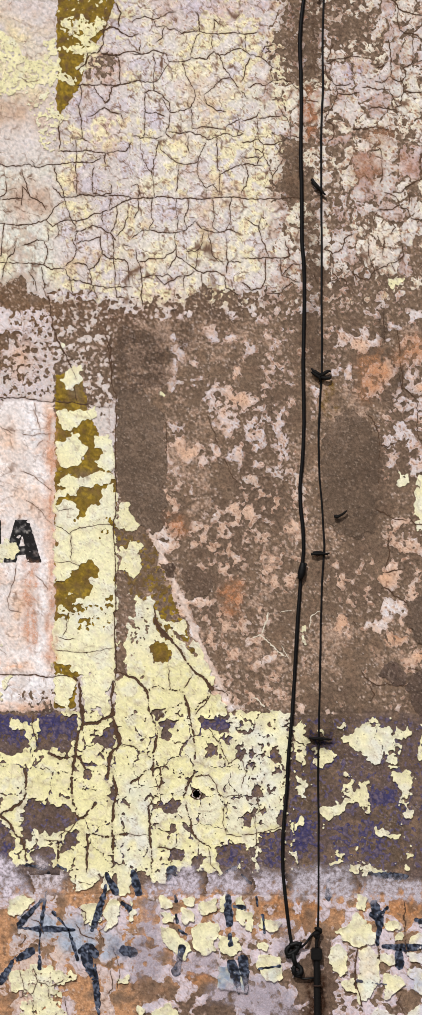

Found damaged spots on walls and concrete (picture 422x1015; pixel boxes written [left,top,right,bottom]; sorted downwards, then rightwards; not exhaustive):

peeling [0,0,121,152]
flaking render [265,0,422,167]
crack [0,0,422,444]
flaking render [265,134,300,211]
flaking render [279,223,301,260]
flaking render [380,166,422,213]
flaking render [0,330,50,401]
peeling [0,538,20,563]
crack [0,335,224,872]
crack [253,610,320,658]
crack [183,728,286,875]
flaking render [109,959,244,1015]